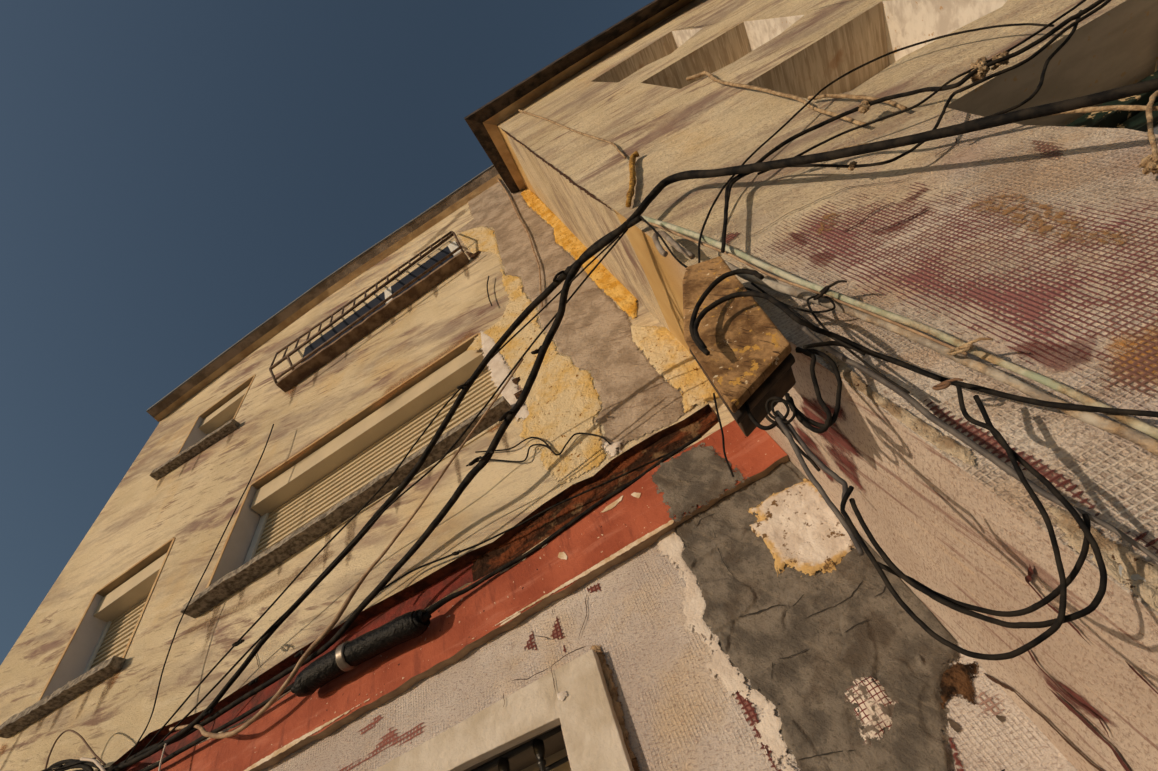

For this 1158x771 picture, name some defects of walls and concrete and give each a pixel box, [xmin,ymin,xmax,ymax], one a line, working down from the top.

peeling [1031,140,1068,160]
peeling [458,188,719,582]
flaking render [747,478,856,579]
peeling [244,690,384,771]
flaking render [462,520,799,771]
peeling [843,674,899,747]
peeling [949,737,964,771]
flaking render [939,661,979,709]